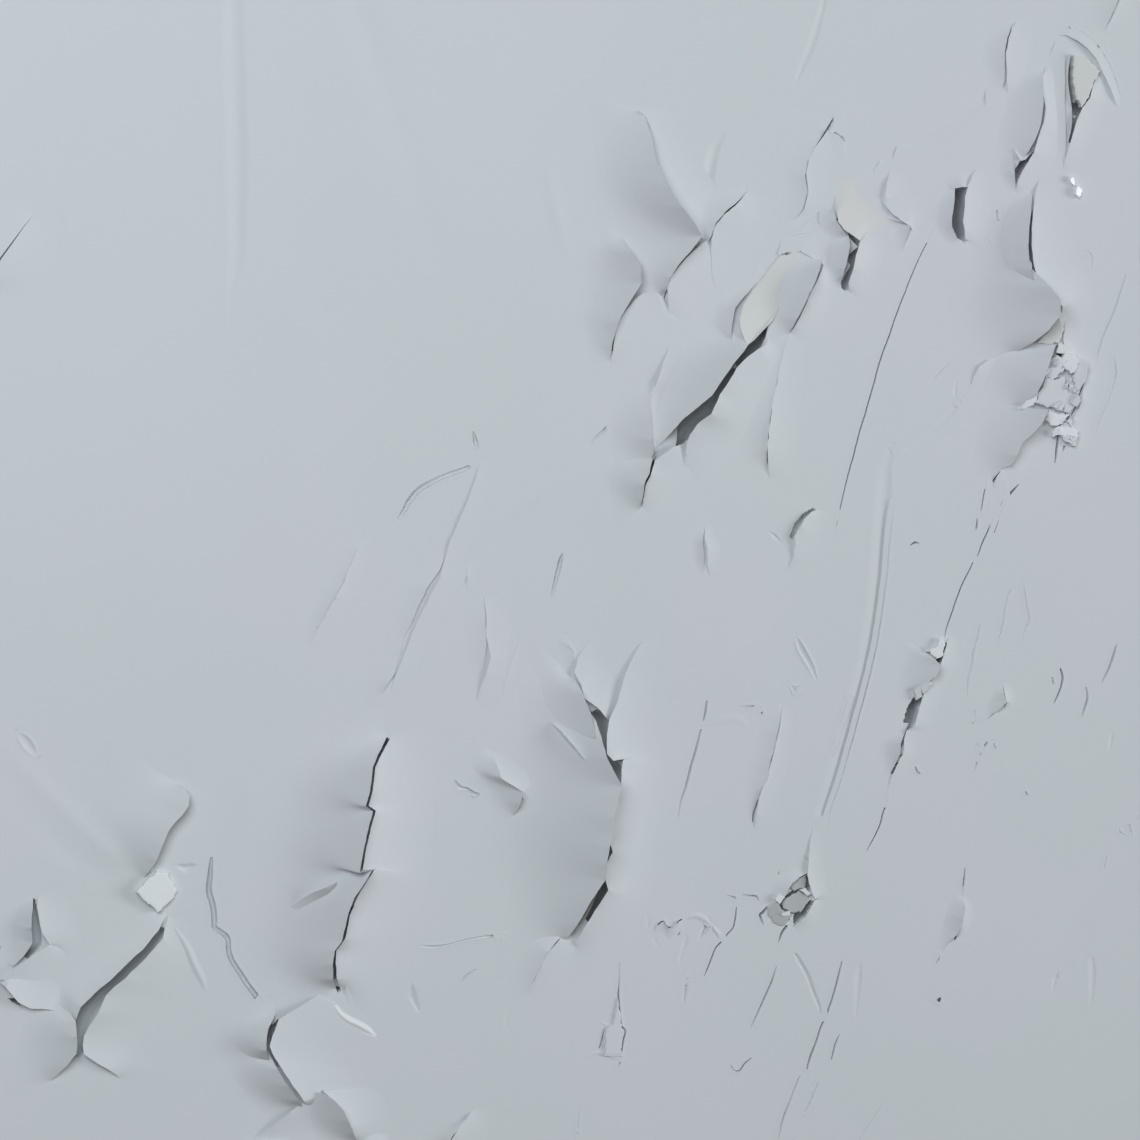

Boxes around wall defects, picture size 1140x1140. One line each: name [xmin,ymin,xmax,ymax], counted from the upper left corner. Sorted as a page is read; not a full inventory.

peeling [583,0,1139,528]
peeling [692,523,721,577]
peeling [883,635,961,803]
peeling [0,871,193,1094]
peeling [225,702,440,1140]
peeling [449,568,667,1070]
peeling [771,816,832,934]
crack [931,865,974,968]
peeling [431,1104,498,1140]